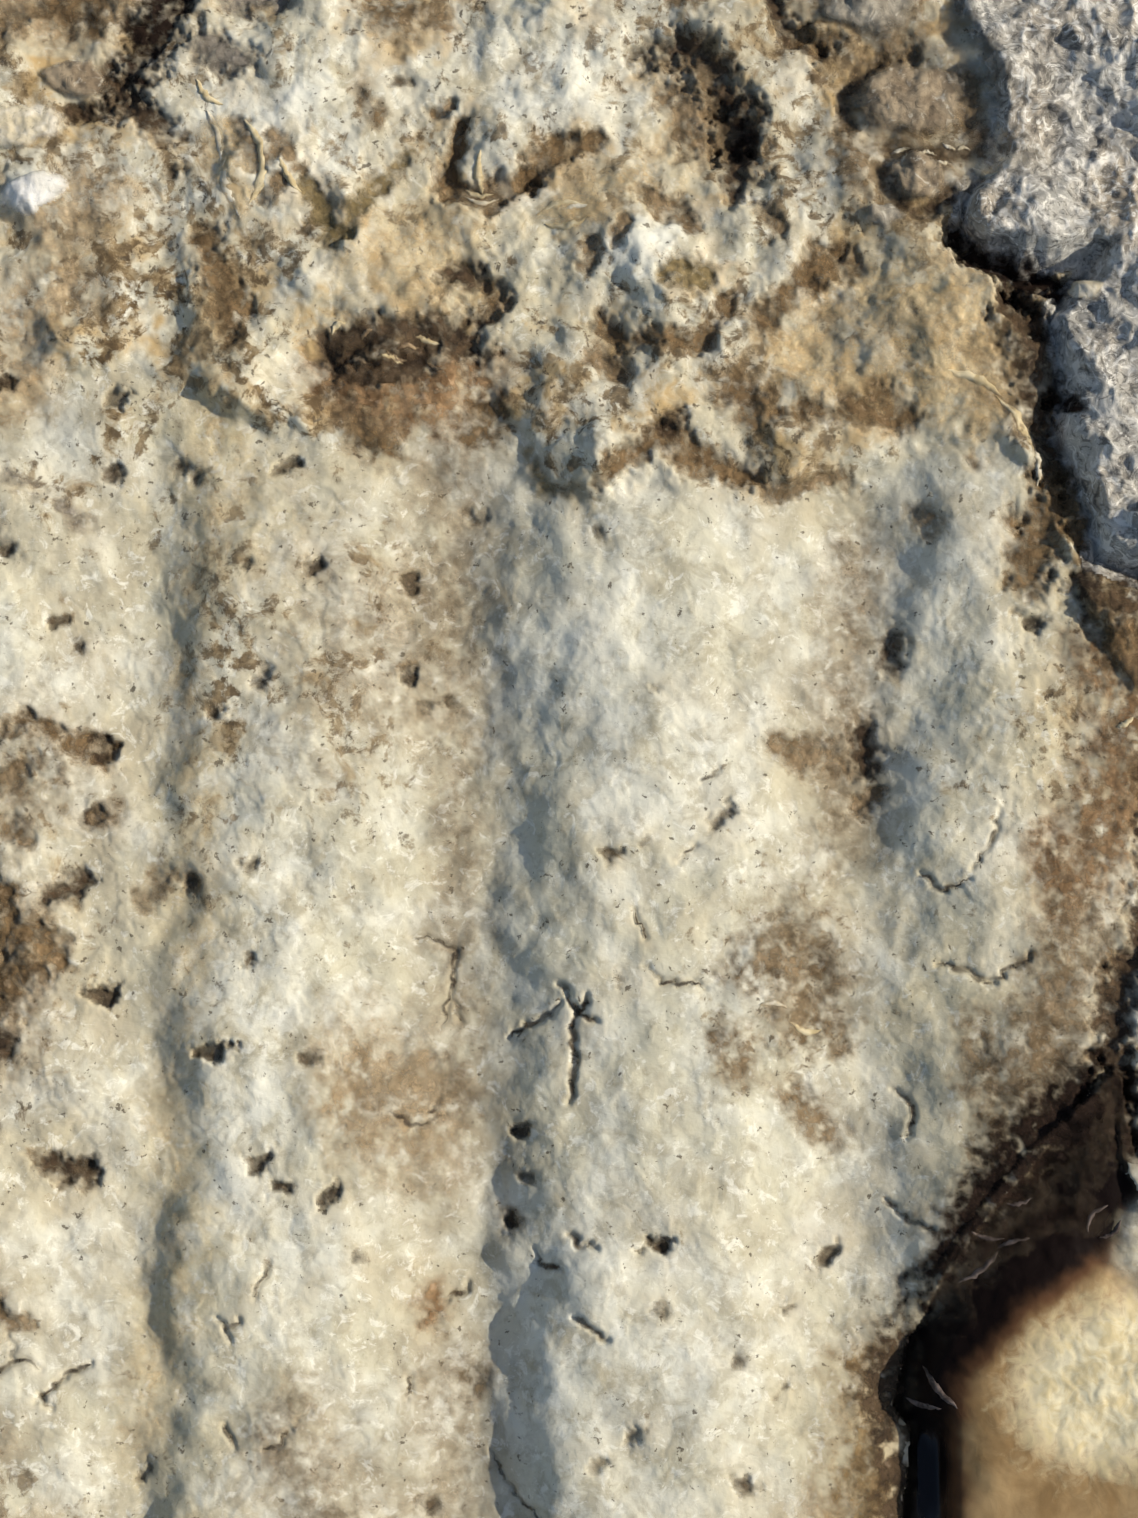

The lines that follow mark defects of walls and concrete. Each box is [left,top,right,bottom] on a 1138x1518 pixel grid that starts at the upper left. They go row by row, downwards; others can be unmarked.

crack [511,987,594,1095]
spalling [958,1198,1121,1283]
spalling [905,1366,957,1410]